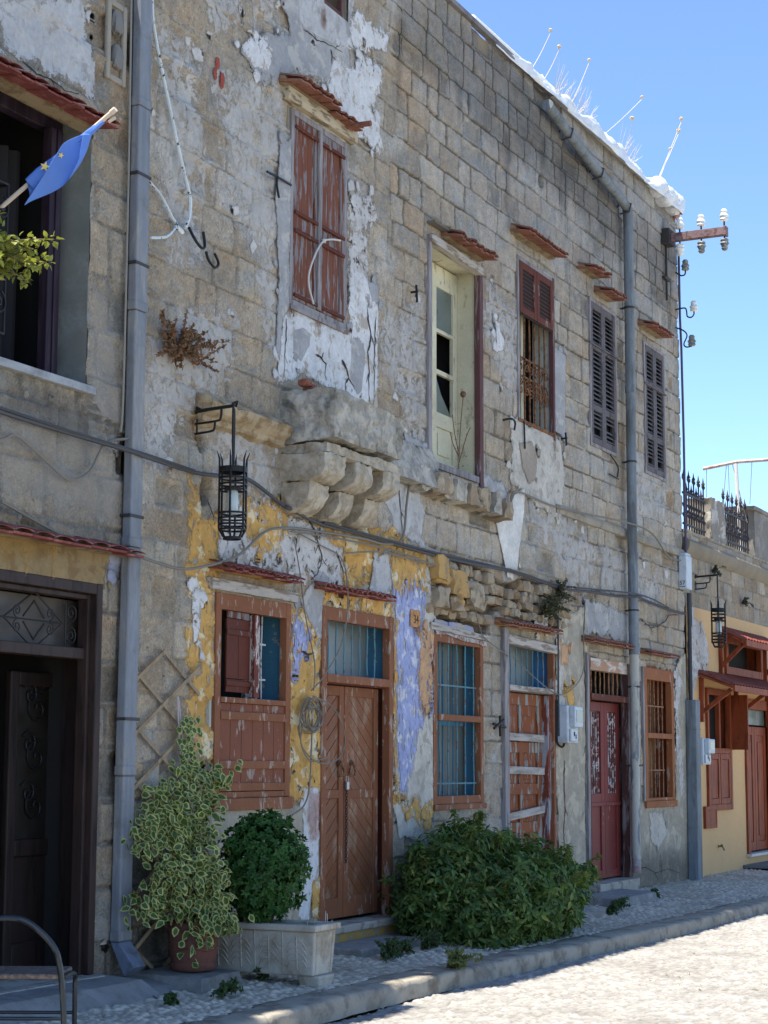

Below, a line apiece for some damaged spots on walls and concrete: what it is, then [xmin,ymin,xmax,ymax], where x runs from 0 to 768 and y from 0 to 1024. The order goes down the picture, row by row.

flaking render [151,0,427,442]
crack [316,314,376,404]
peeling [183,431,487,921]